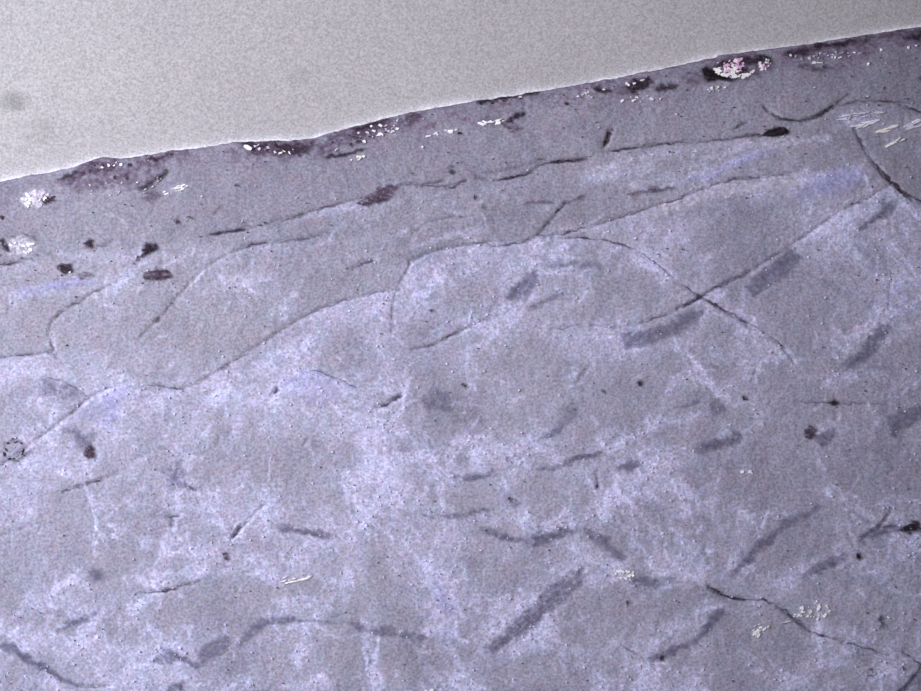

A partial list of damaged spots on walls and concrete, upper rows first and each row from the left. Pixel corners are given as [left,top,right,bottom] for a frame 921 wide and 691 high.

crack [764,98,848,122]
crack [603,129,674,152]
crack [498,159,581,181]
crack [872,161,921,202]
crack [556,205,626,246]
crack [647,257,720,308]
crack [711,587,789,615]